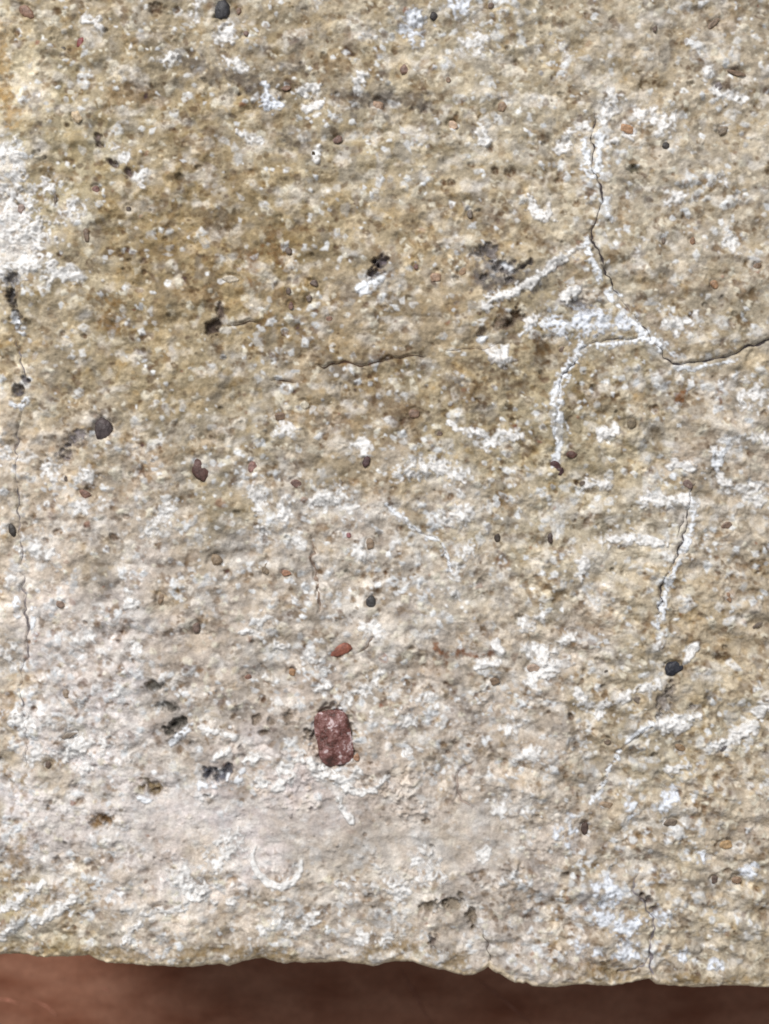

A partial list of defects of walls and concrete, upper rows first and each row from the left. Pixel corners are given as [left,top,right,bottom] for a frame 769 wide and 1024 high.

crack [315,355,422,369]
crack [545,114,769,468]
crack [651,438,730,630]